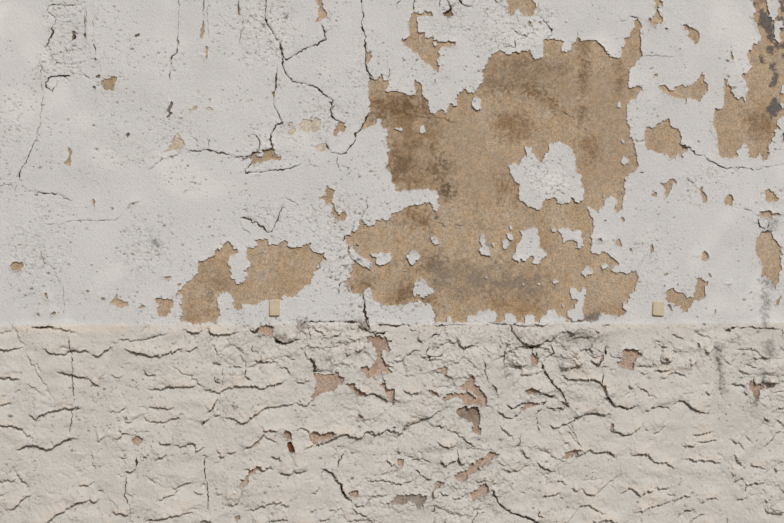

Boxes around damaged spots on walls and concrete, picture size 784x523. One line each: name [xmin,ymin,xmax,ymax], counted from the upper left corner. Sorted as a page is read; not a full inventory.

crack [147,0,370,178]
crack [361,0,390,80]
peeling [712,0,784,160]
peeling [344,0,667,325]
peeling [644,119,690,158]
peeling [155,238,327,325]
peeling [755,232,783,305]
crack [241,295,409,380]
flaking render [428,375,487,435]
crack [484,323,580,459]
crack [322,454,373,523]
crack [493,492,545,523]